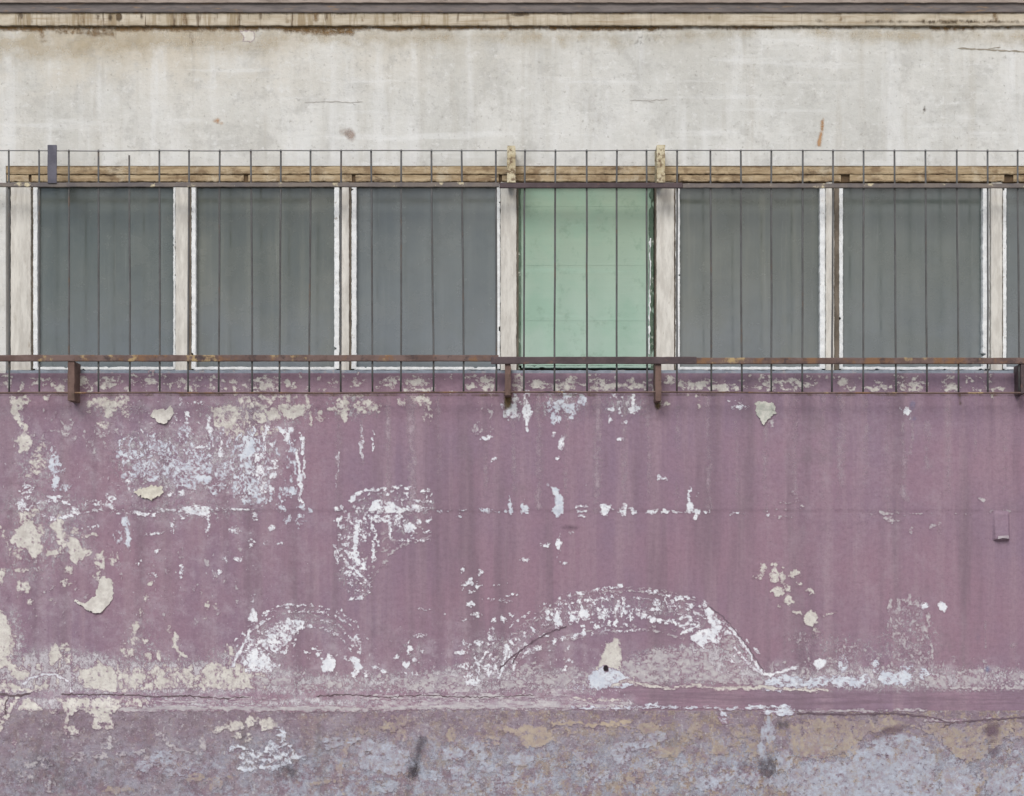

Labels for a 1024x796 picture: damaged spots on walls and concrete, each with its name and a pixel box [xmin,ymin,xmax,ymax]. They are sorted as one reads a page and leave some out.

peeling [0,370,1024,783]
crack [499,626,567,670]
crack [0,693,31,715]
crack [62,692,249,700]
crack [317,693,534,701]
crack [796,712,1024,728]
peeling [11,737,57,793]
peeling [563,749,751,792]
peeling [918,737,1023,796]